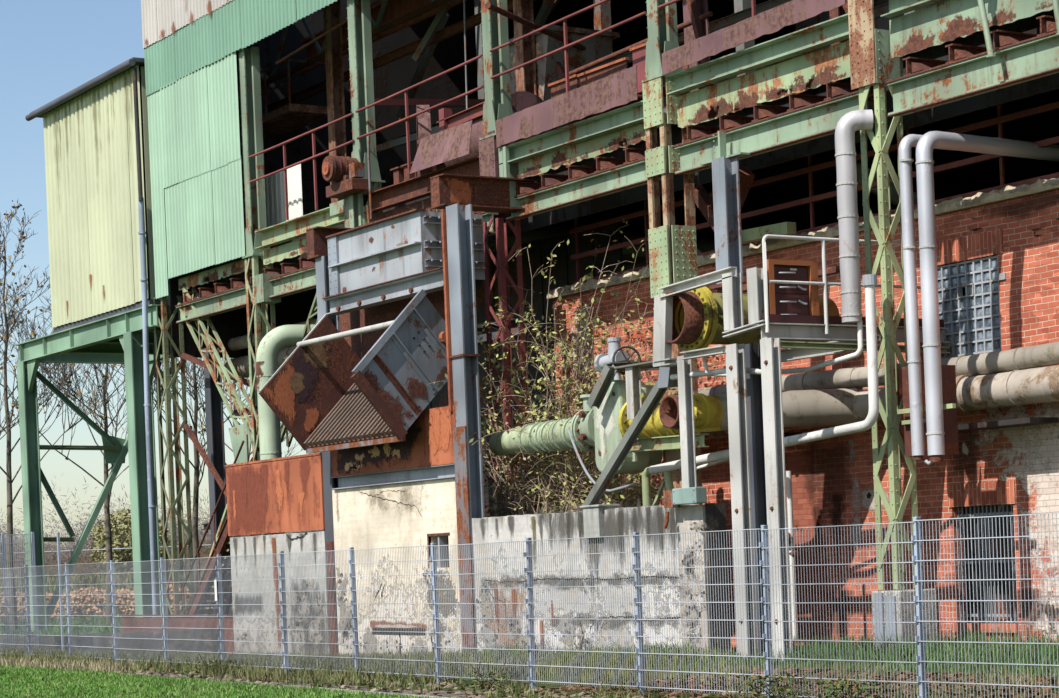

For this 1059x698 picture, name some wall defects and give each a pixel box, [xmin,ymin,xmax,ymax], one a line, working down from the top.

rust [897,9,1016,56]
rust [688,66,846,124]
rust [256,361,319,432]
rust [364,366,453,455]
rust [229,459,310,534]
rust [272,537,281,646]
spalling [288,579,324,653]
spalling [336,568,428,657]
spalling [440,630,460,654]
damp [480,502,676,595]
damp [551,612,676,629]
spalling [676,520,705,652]